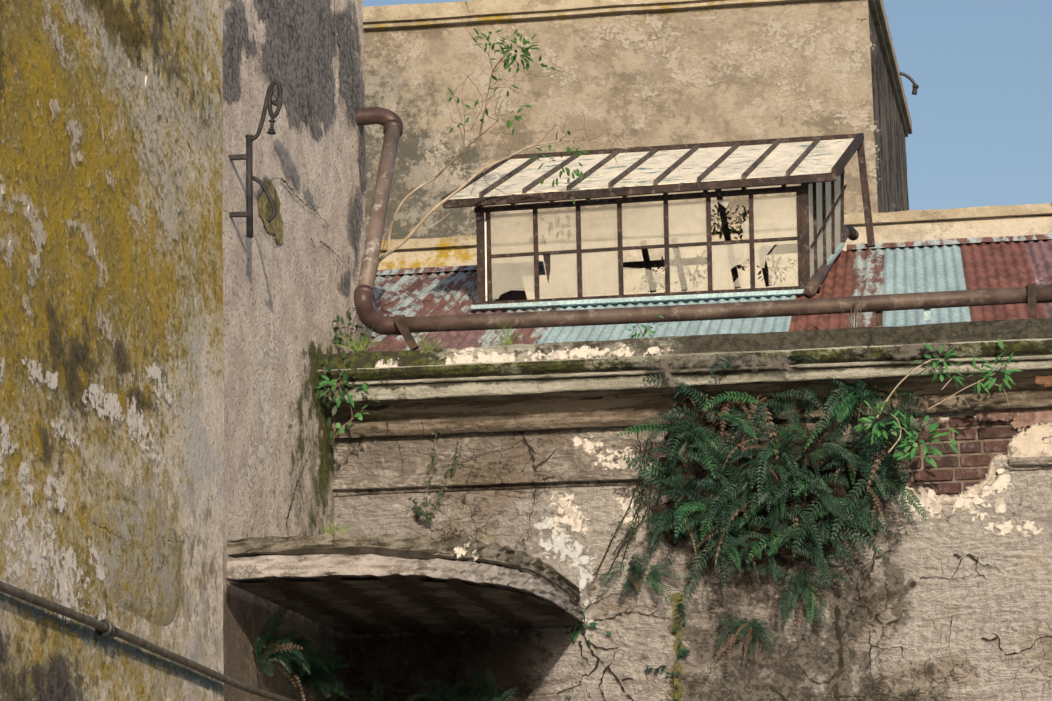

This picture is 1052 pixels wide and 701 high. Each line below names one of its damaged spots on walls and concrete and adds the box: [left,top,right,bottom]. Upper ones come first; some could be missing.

peeling [41,0,220,255]
water stain [223,0,366,294]
peeling [0,173,47,316]
water stain [375,358,399,368]
water stain [441,344,671,365]
flaking render [573,436,655,478]
flaking render [877,406,1052,506]
water stain [0,591,224,701]
crack [260,450,678,701]
crack [803,540,914,701]
crack [920,553,1005,582]
crack [981,633,1052,662]